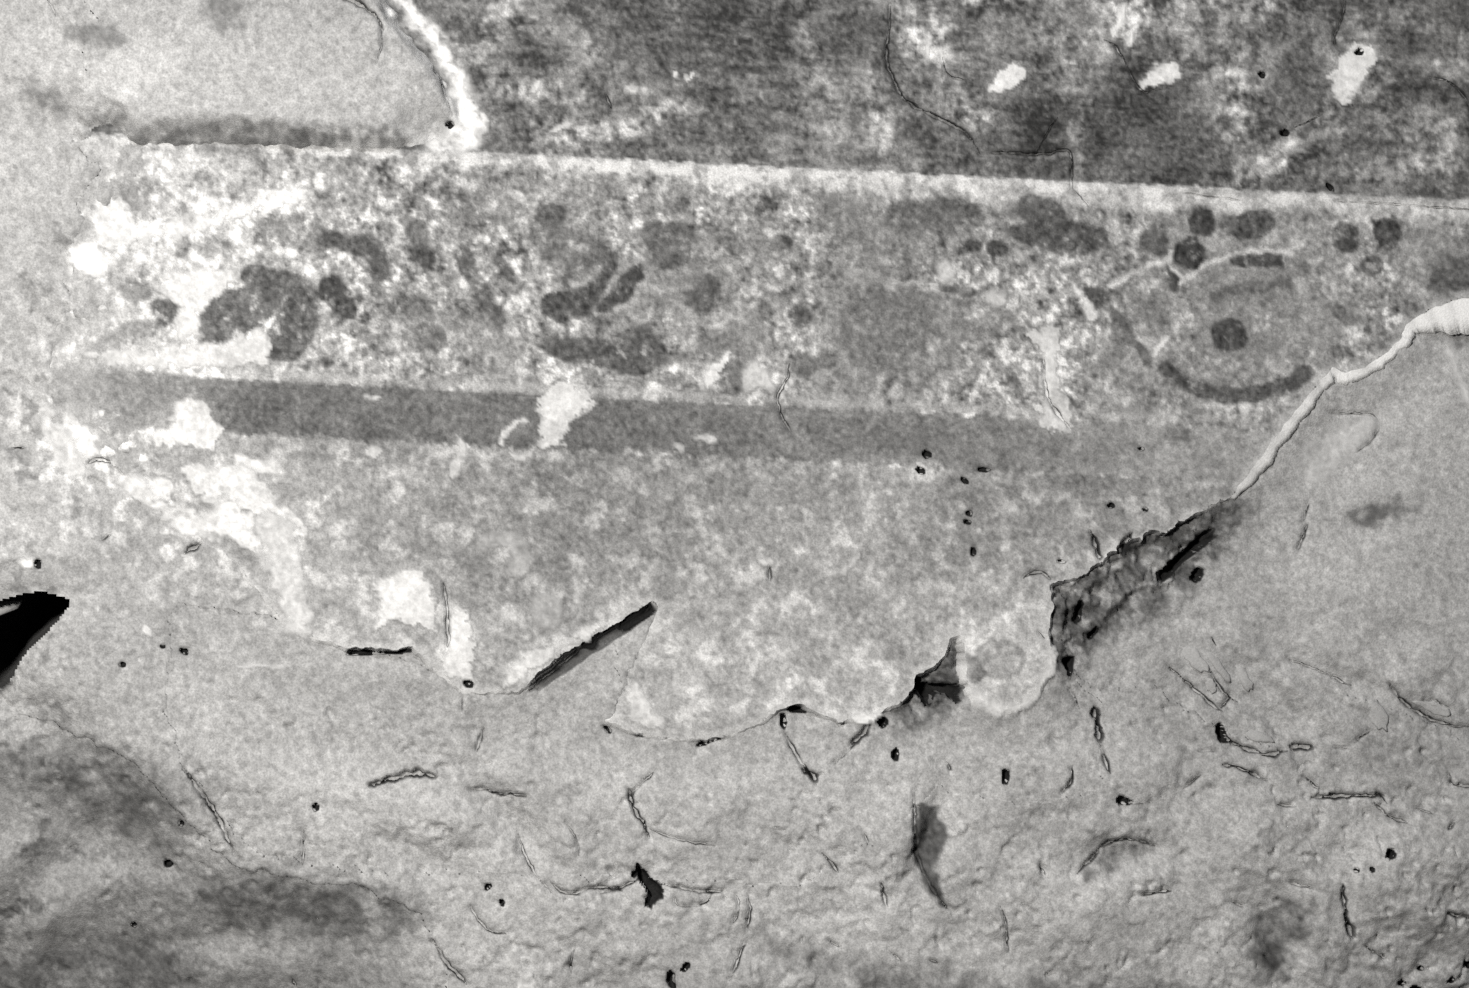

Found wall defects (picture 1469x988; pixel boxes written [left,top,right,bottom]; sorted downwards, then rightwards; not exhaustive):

crack [355,0,383,58]
peeling [65,184,314,278]
peeling [84,266,272,370]
peeling [937,260,955,282]
peeling [986,288,1008,308]
peeling [1073,284,1098,321]
crack [1090,531,1132,559]
crack [532,604,654,685]
flaking render [0,298,1469,988]
crack [1396,693,1465,727]